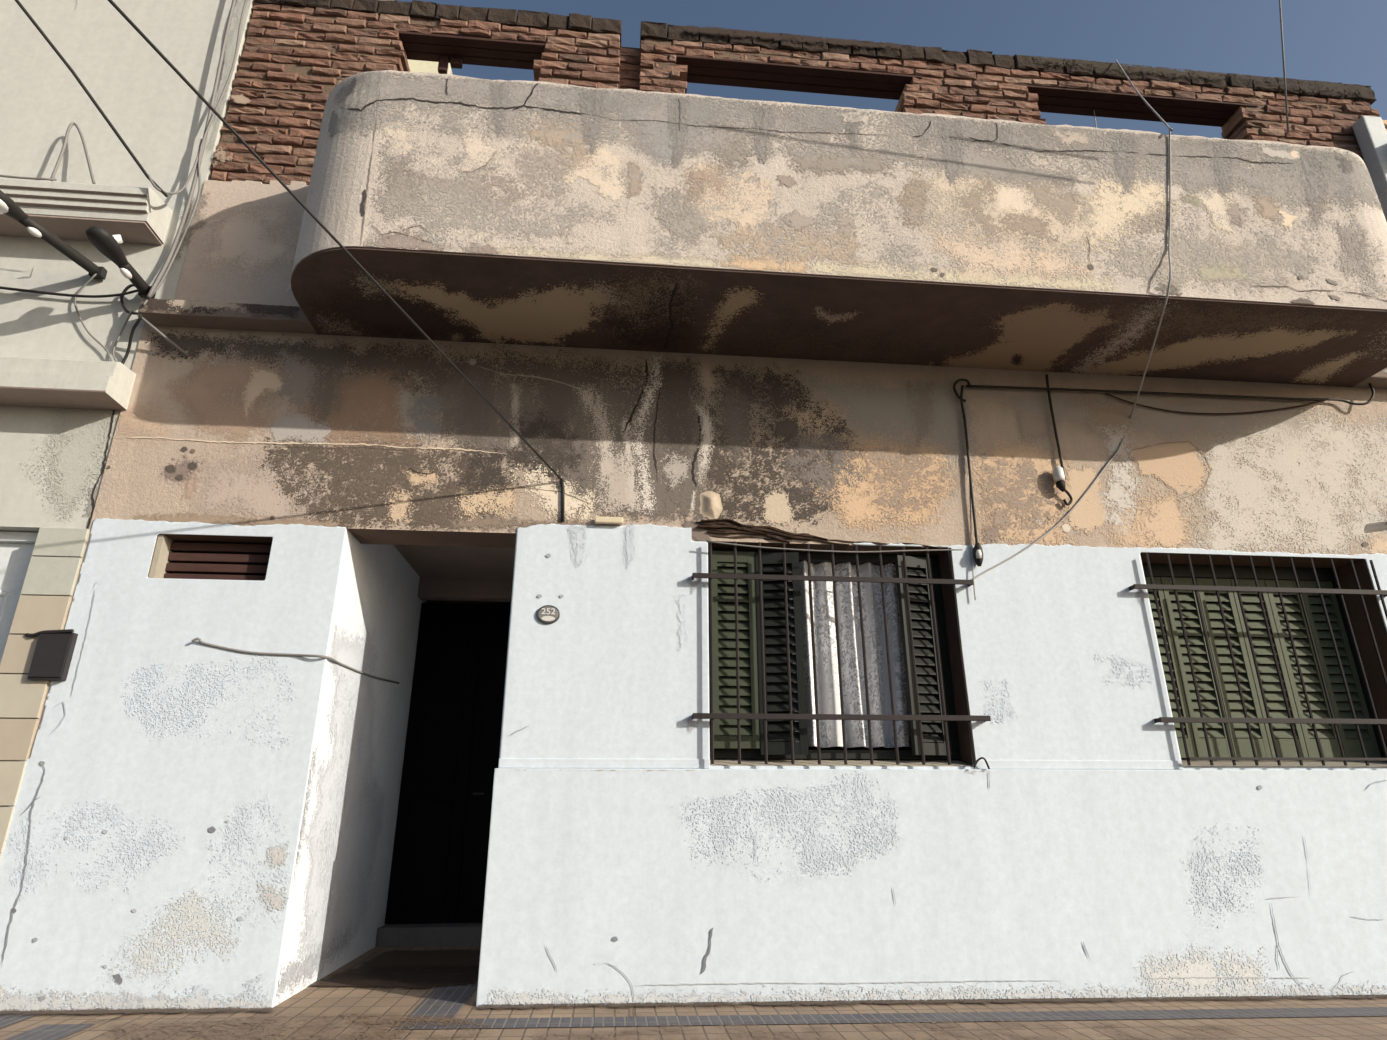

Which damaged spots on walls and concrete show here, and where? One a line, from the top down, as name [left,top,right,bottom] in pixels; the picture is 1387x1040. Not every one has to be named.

peeling [361,116,645,254]
crack [341,74,880,246]
peeling [675,160,867,271]
peeling [1262,146,1301,160]
peeling [345,267,766,365]
crack [478,283,678,481]
damp [21,71,1387,570]
peeling [781,162,1387,555]
spalling [681,520,713,543]
crack [691,412,724,519]
crack [2,410,589,962]
crack [587,928,1062,1017]